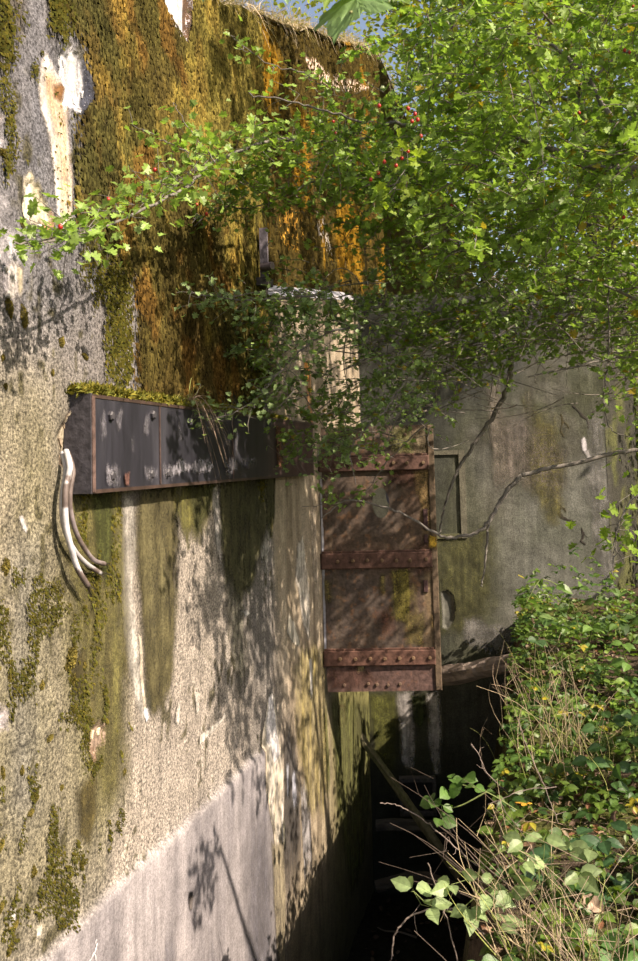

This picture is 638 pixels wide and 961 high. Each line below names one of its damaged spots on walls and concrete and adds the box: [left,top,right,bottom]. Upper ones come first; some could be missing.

spalling [58,47,95,114]
water stain [489,386,560,487]
water stain [581,418,615,589]
water stain [91,492,152,721]
water stain [188,483,249,692]
water stain [464,619,512,655]
water stain [399,692,441,774]
water stain [79,777,96,842]